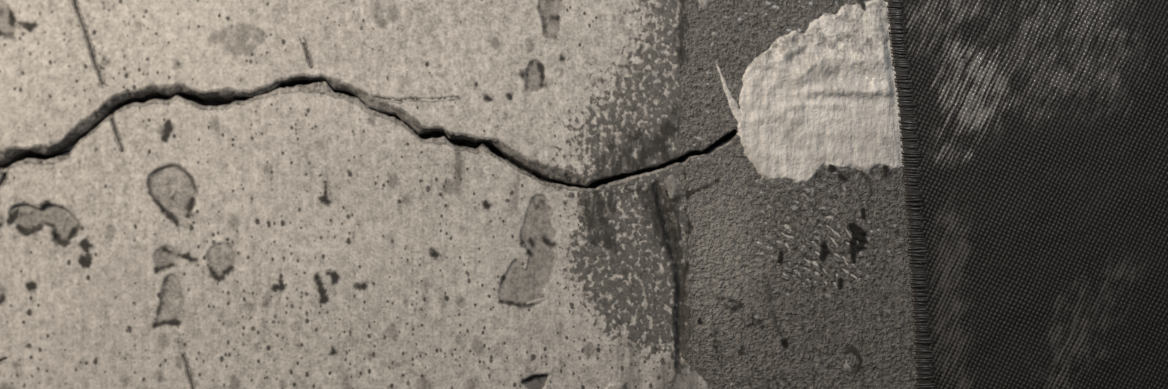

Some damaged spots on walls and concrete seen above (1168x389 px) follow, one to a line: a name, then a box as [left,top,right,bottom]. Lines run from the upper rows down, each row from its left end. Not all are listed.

crack [0,0,738,372]